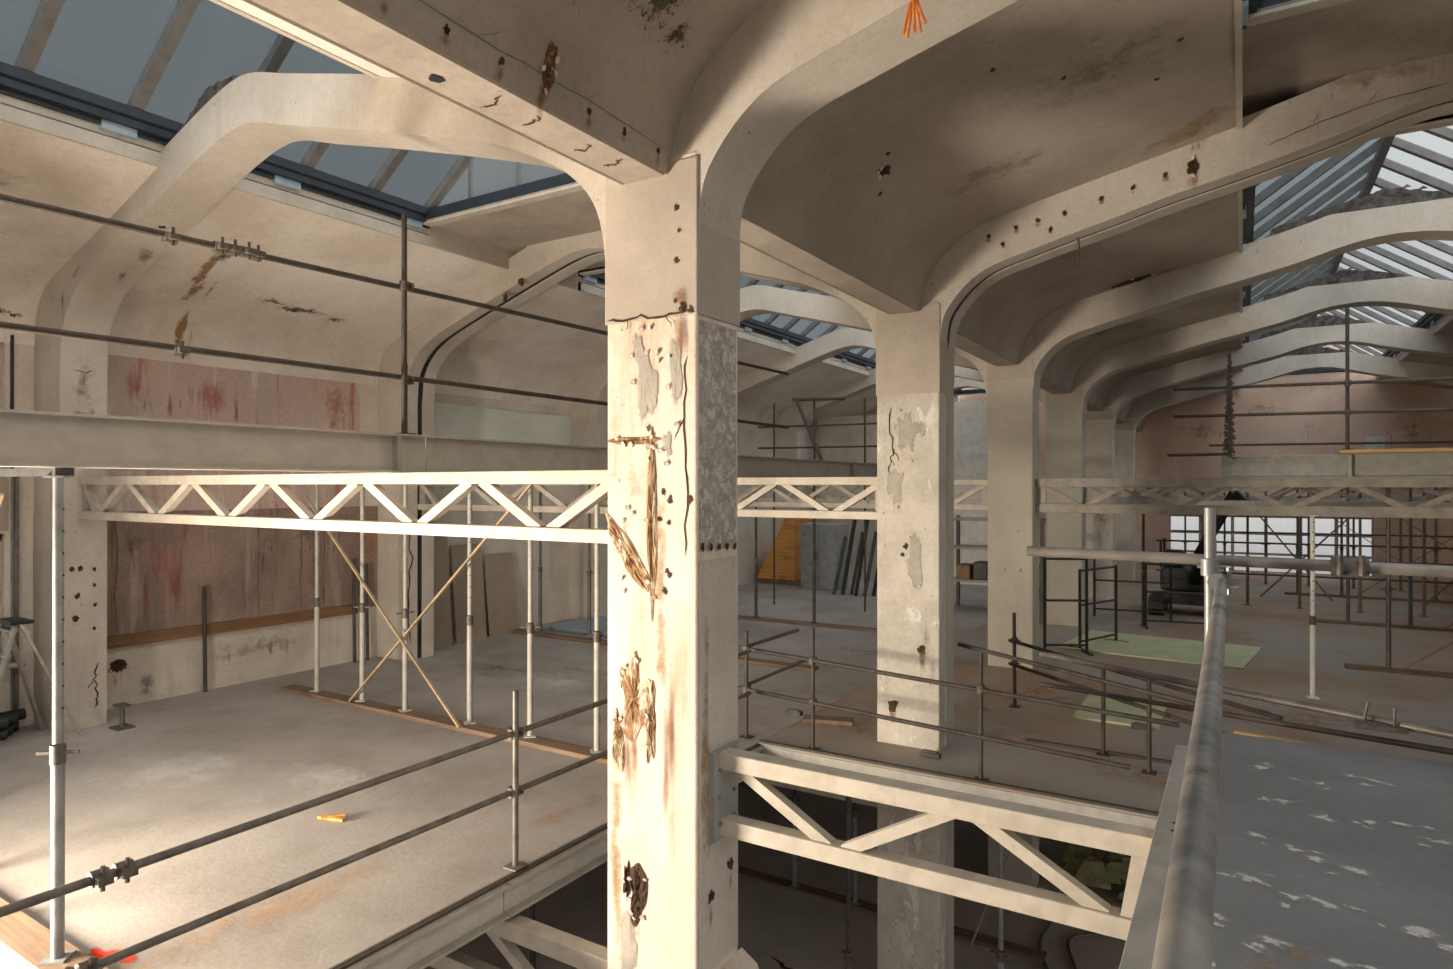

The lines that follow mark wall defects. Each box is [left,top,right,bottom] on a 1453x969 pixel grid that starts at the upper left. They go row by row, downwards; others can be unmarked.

water stain [627,0,692,55]
rust [175,257,218,344]
peeling [614,325,682,466]
spalling [622,860,647,927]